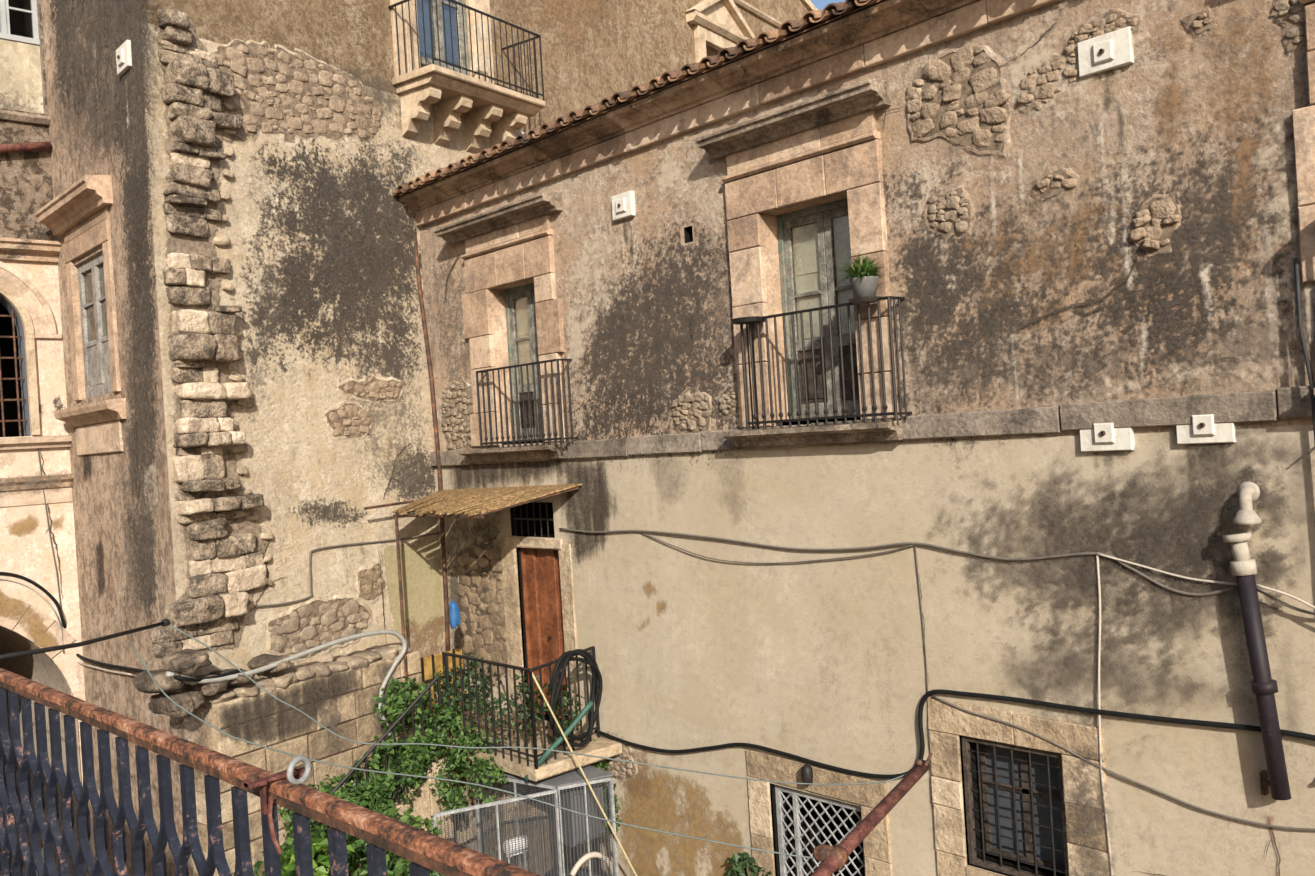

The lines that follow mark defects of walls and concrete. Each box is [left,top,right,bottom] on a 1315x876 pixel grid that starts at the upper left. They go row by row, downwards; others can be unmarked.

flaking render [906,8,1144,160]
water stain [0,0,163,636]
spalling [146,7,384,667]
spalling [323,375,406,440]
water stain [230,138,612,562]
flaking render [440,379,480,451]
water stain [565,217,745,441]
water stain [883,9,1315,415]
spalling [1128,192,1183,260]
flaking render [265,533,508,687]
water stain [940,424,1303,725]
crack [1264,817,1281,876]